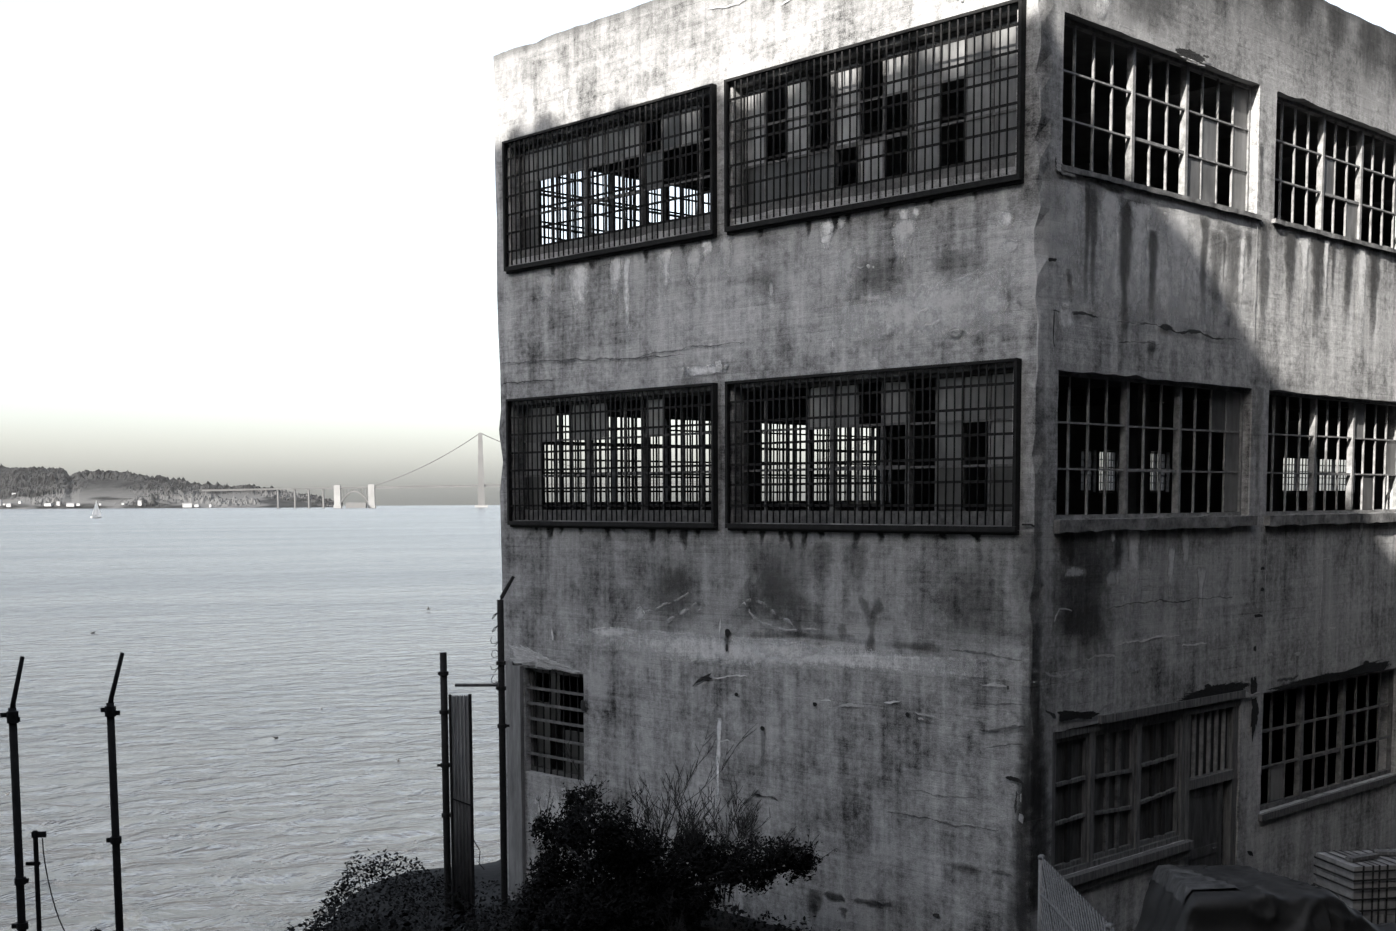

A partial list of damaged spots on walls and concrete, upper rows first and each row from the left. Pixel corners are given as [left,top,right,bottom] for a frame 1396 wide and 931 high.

water stain [1297,0,1344,28]
water stain [1362,23,1396,68]
water stain [1064,180,1380,372]
water stain [593,511,1207,931]